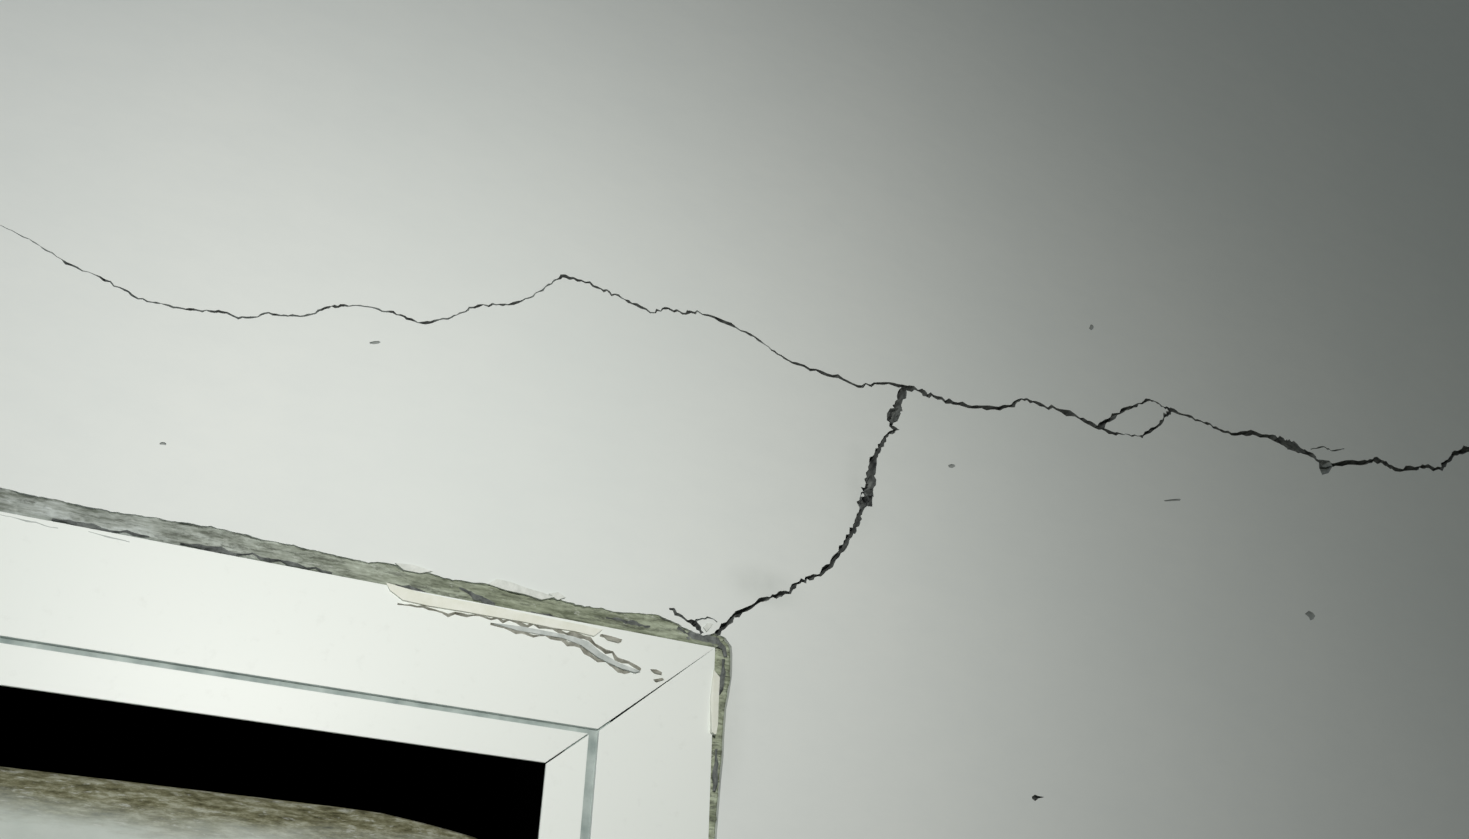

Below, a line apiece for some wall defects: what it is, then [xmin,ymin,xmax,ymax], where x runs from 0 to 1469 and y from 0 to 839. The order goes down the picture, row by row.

crack [0,225,1469,639]
peeling [386,563,664,682]
flaking render [669,608,717,634]
peeling [710,670,720,736]